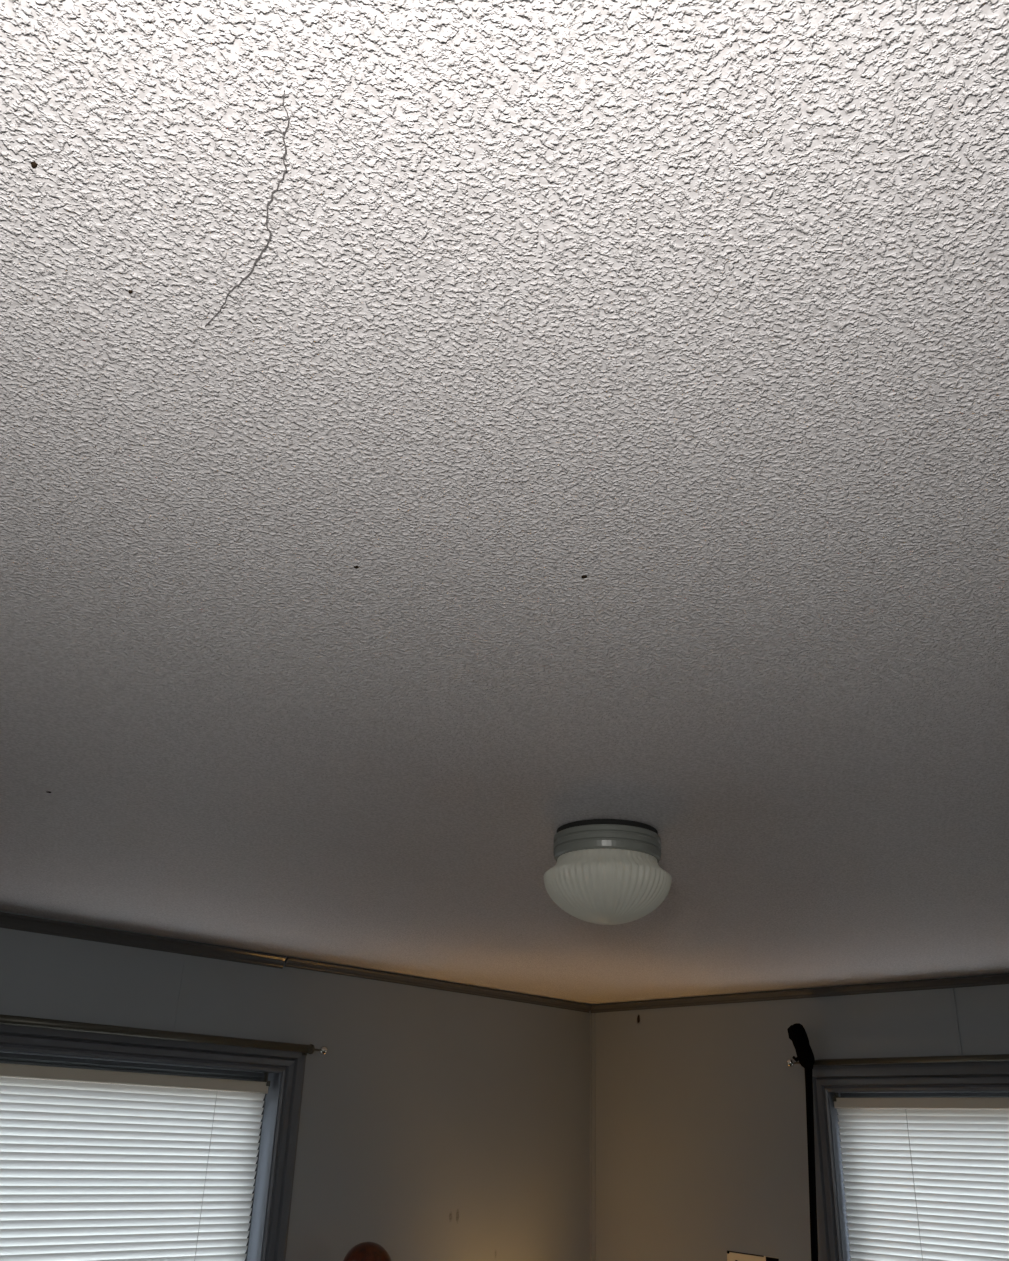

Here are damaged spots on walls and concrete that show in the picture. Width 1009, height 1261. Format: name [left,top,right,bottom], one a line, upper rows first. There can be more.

crack [205,90,290,326]